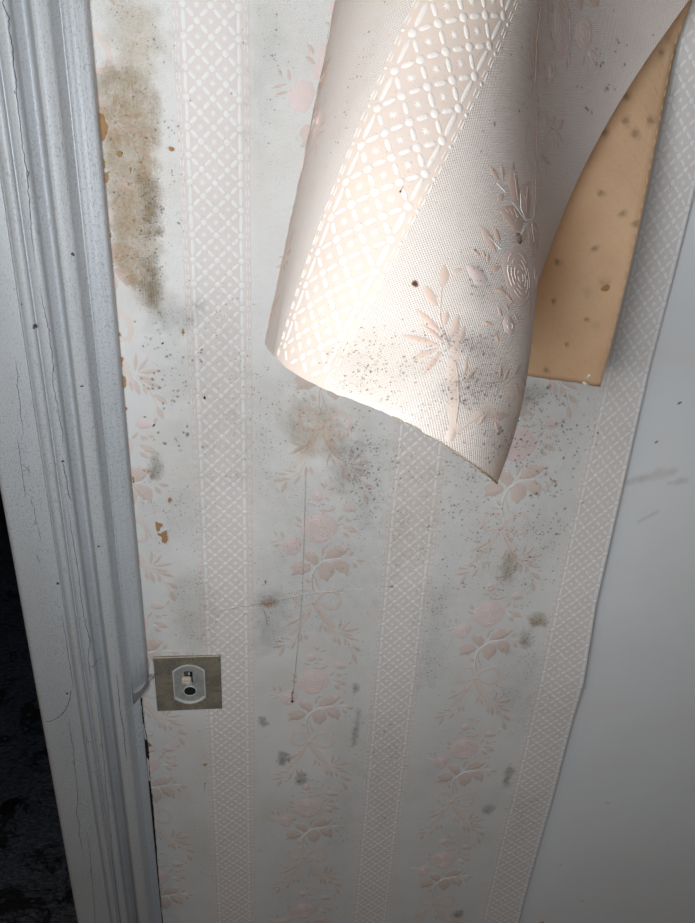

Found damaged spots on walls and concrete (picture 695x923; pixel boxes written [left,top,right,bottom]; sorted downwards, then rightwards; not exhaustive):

water stain [103,75,163,313]
peeling [265,0,692,484]
peeling [155,521,168,544]